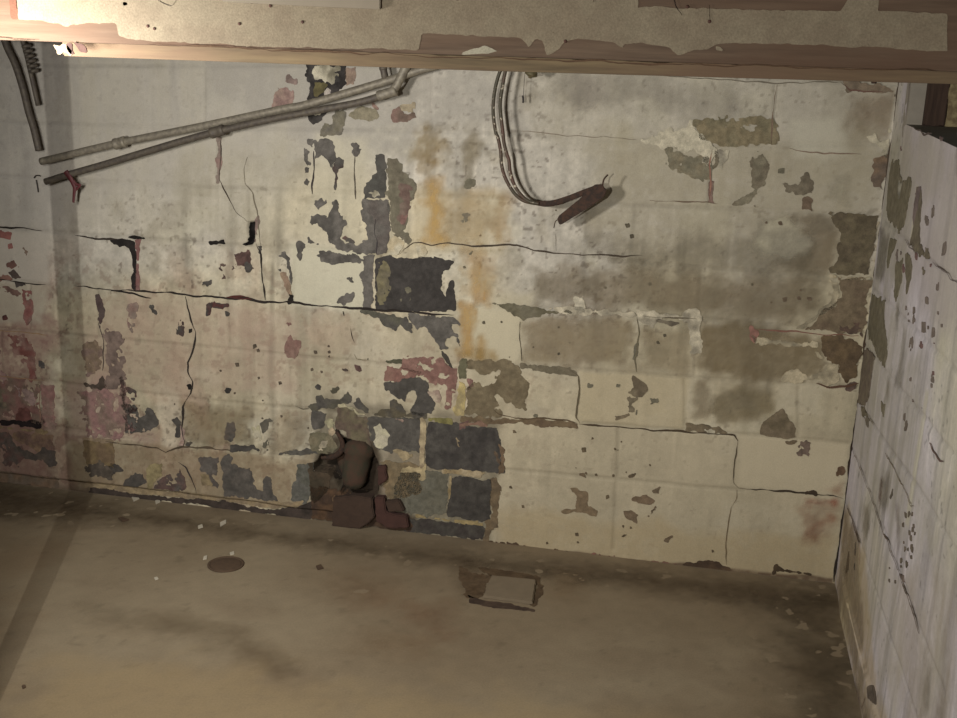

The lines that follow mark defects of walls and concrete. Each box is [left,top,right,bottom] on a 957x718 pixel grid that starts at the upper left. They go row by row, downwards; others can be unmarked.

water stain [641,120,729,170]
peeling [664,115,814,211]
peeling [84,294,159,434]
peeling [202,215,260,287]
peeling [198,454,278,501]
crack [76,136,449,490]
peeling [278,102,578,546]
crack [398,235,640,258]
peeling [615,375,659,420]
water stain [546,217,888,388]
peeling [760,408,811,456]
peeling [805,154,947,428]